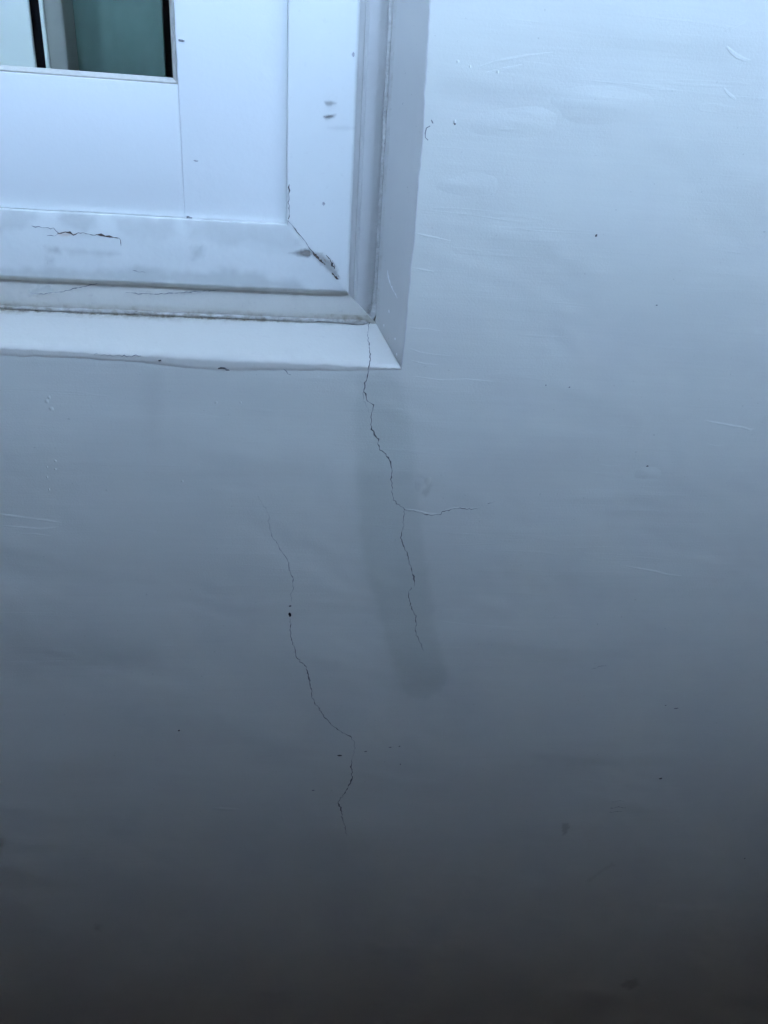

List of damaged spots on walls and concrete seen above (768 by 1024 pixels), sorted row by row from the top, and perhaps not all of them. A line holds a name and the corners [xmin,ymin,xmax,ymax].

crack [363,322,489,649]
crack [265,507,355,830]